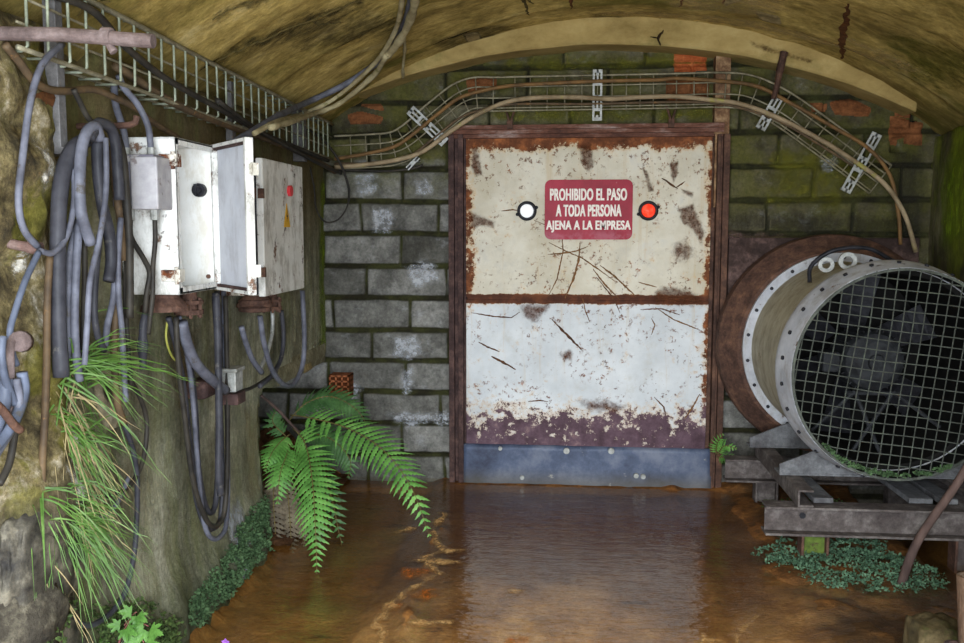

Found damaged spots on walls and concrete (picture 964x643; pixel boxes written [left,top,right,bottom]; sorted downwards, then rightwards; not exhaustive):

crack [521,0,534,15]
crack [201,0,362,70]
spalling [888,113,923,146]
corrosion [472,148,481,174]
corrosion [581,146,593,169]
corrosion [471,214,493,227]
corrosion [679,190,703,240]
leakage [411,264,435,285]
corrosion [655,288,701,304]